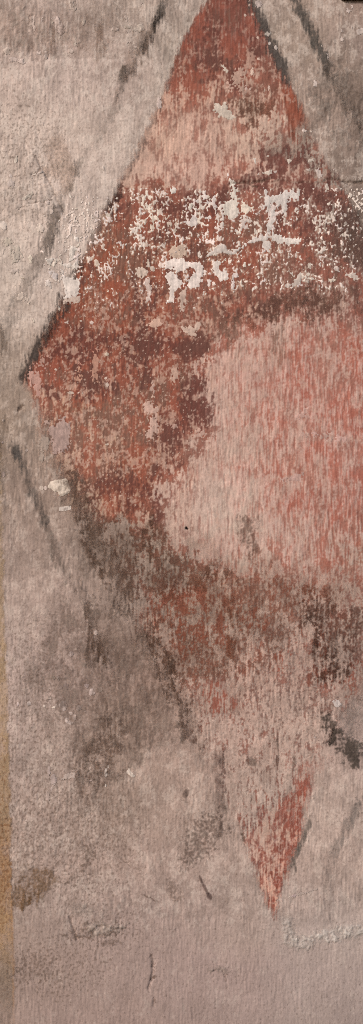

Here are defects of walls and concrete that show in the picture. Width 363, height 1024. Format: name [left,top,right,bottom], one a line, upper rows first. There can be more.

peeling [0,158,363,330]
spalling [39,478,71,496]
water stain [322,713,336,745]